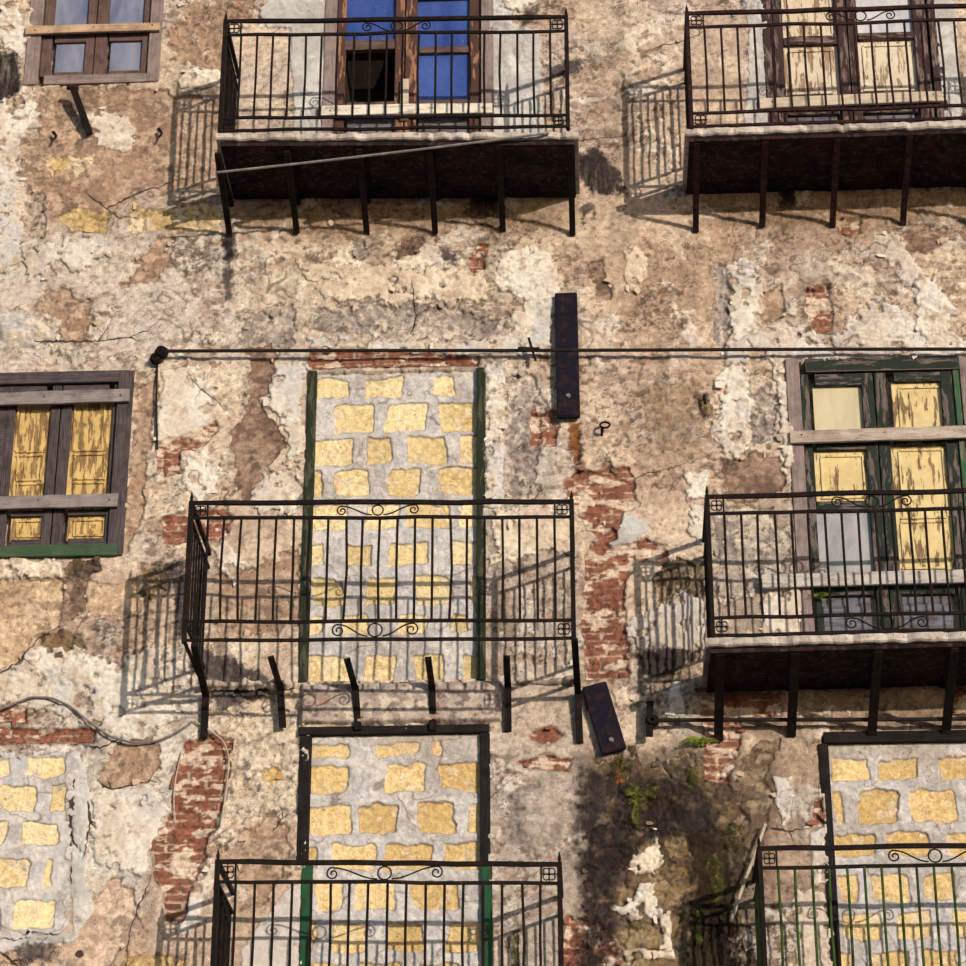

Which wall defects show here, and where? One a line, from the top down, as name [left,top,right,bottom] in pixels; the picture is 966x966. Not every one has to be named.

crack [86,178,188,218]
flaking render [836,215,862,235]
flaking render [123,223,966,707]
flaking render [0,556,305,966]
flaking render [518,724,573,771]
spalling [563,687,795,966]
damp [686,826,738,966]